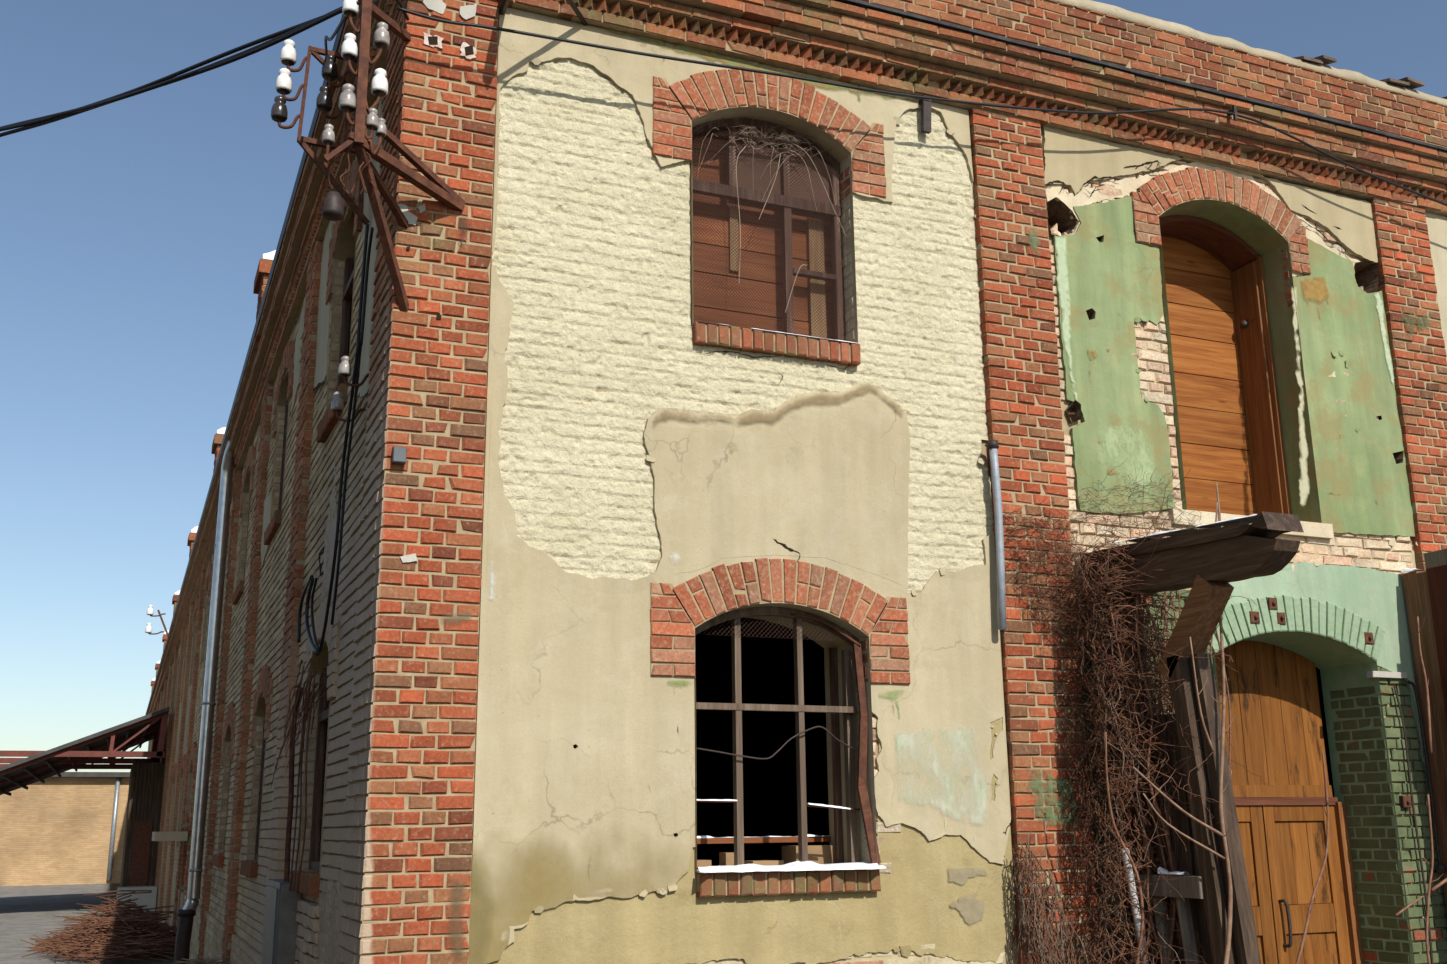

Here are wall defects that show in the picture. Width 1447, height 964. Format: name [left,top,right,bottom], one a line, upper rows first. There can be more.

flaking render [1045,162,1379,293]
flaking render [490,58,994,596]
flaking render [1131,315,1174,415]
flaking render [1328,350,1351,377]
spalling [1064,400,1081,423]
crack [772,538,800,561]
flaking render [1069,510,1206,565]
flaking render [1276,535,1418,575]
spalling [867,713,888,785]
flaking render [488,815,1016,964]